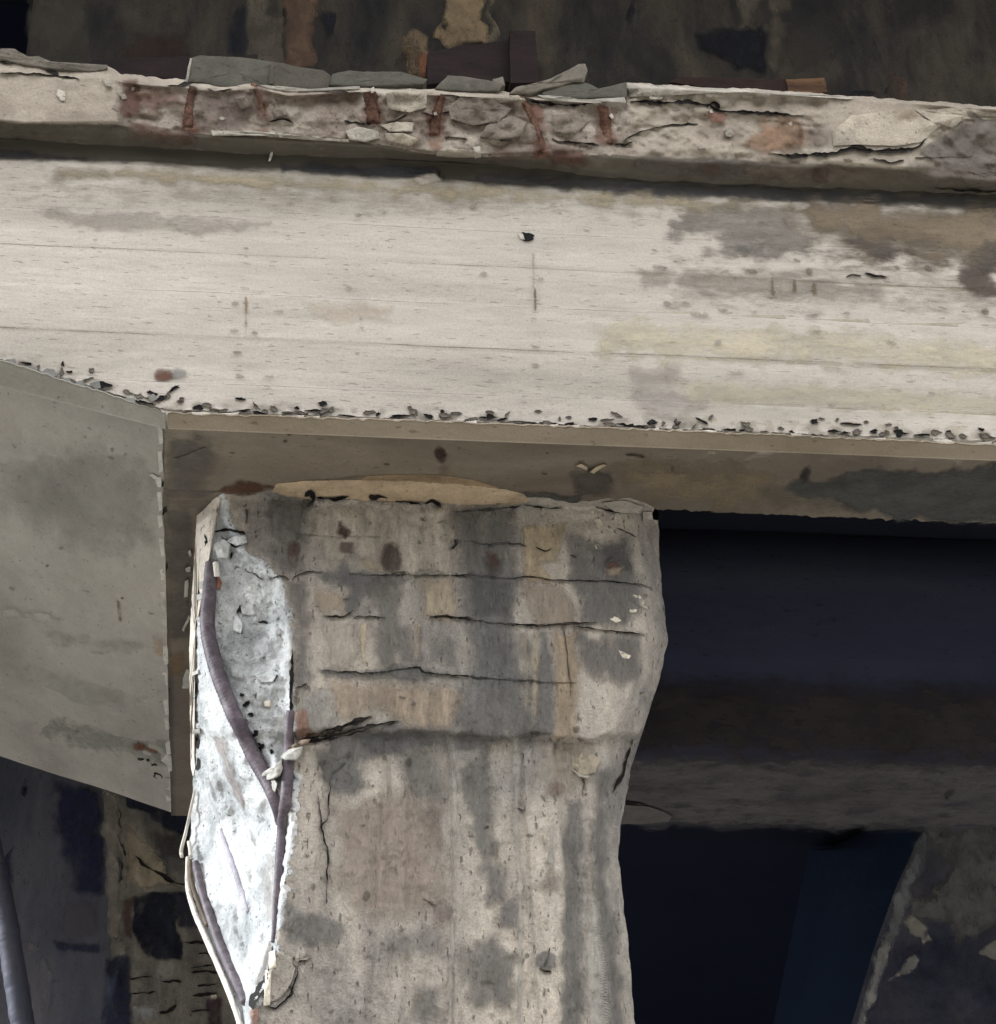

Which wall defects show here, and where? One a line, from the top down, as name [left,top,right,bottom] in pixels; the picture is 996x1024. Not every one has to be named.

corrosion [120,81,270,144]
corrosion [297,91,383,125]
spalling [103,80,852,158]
corrosion [493,95,585,166]
crack [525,97,802,146]
spalling [832,108,996,146]
damp [0,111,996,296]
damp [617,459,996,524]
crack [330,615,640,695]
spalling [101,427,311,1024]
crack [296,716,398,743]
damp [268,497,640,1024]